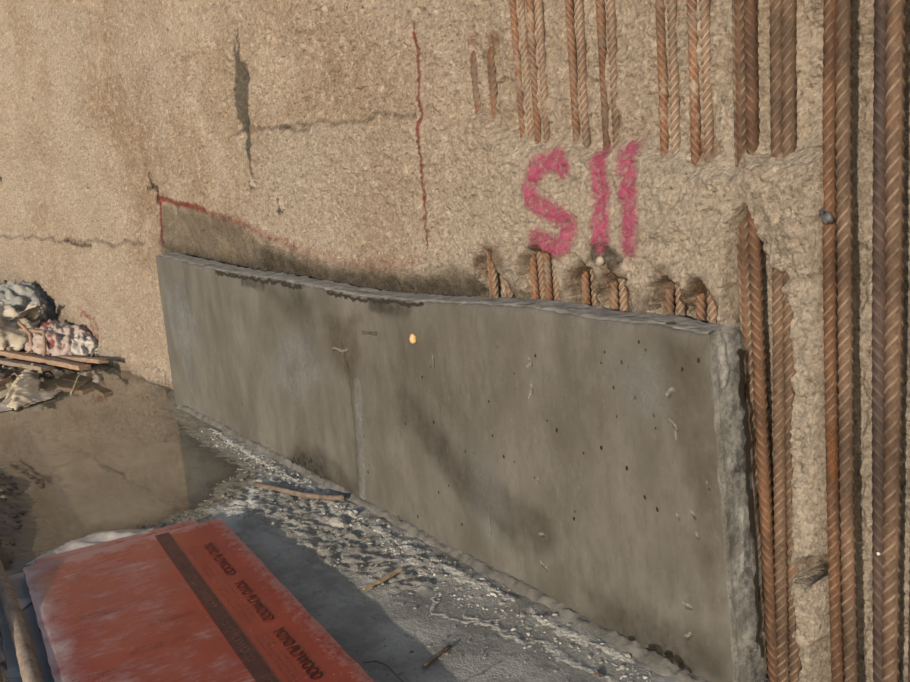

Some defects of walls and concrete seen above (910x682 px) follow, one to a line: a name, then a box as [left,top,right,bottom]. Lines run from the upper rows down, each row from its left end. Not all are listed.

leakage [233,29,251,164]
spalling [476,248,632,312]
spalling [653,235,746,682]
spalling [755,230,794,542]